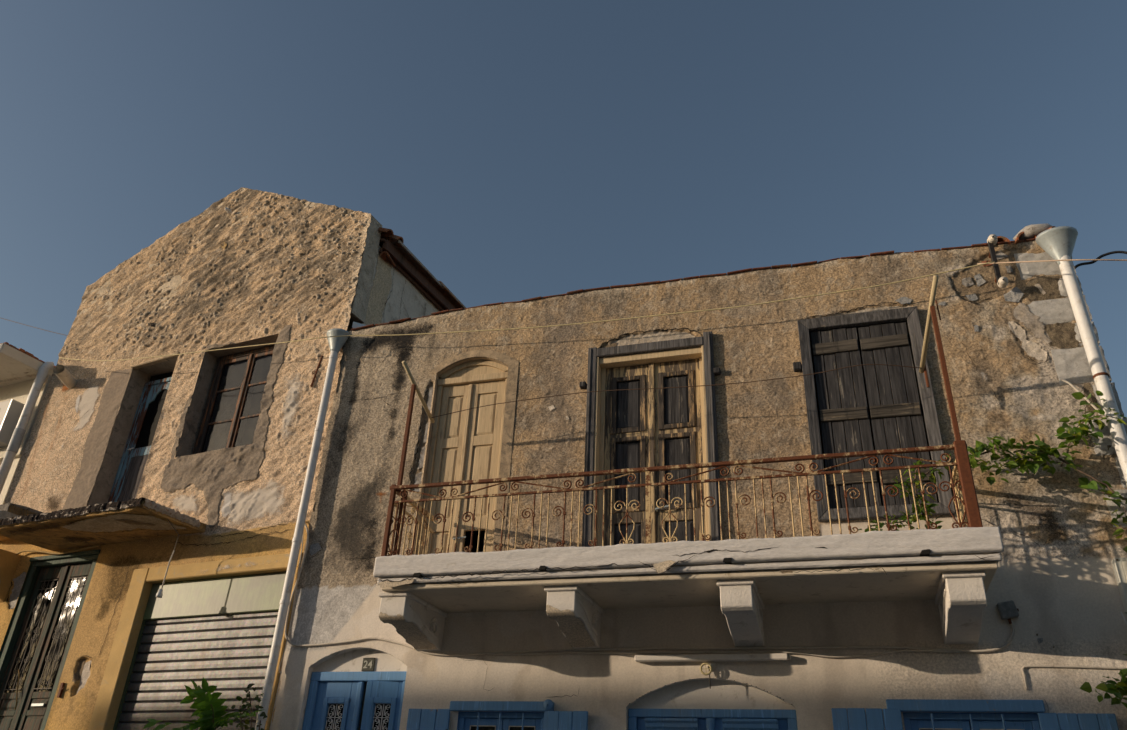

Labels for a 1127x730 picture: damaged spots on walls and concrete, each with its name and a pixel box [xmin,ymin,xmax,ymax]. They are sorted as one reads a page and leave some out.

spalling [950,247,1064,304]
spalling [1008,321,1079,364]
peeling [73,386,100,431]
damp [349,314,435,441]
spalling [1083,383,1097,413]
peeling [221,480,285,525]
damp [326,467,389,572]
damp [96,554,162,620]